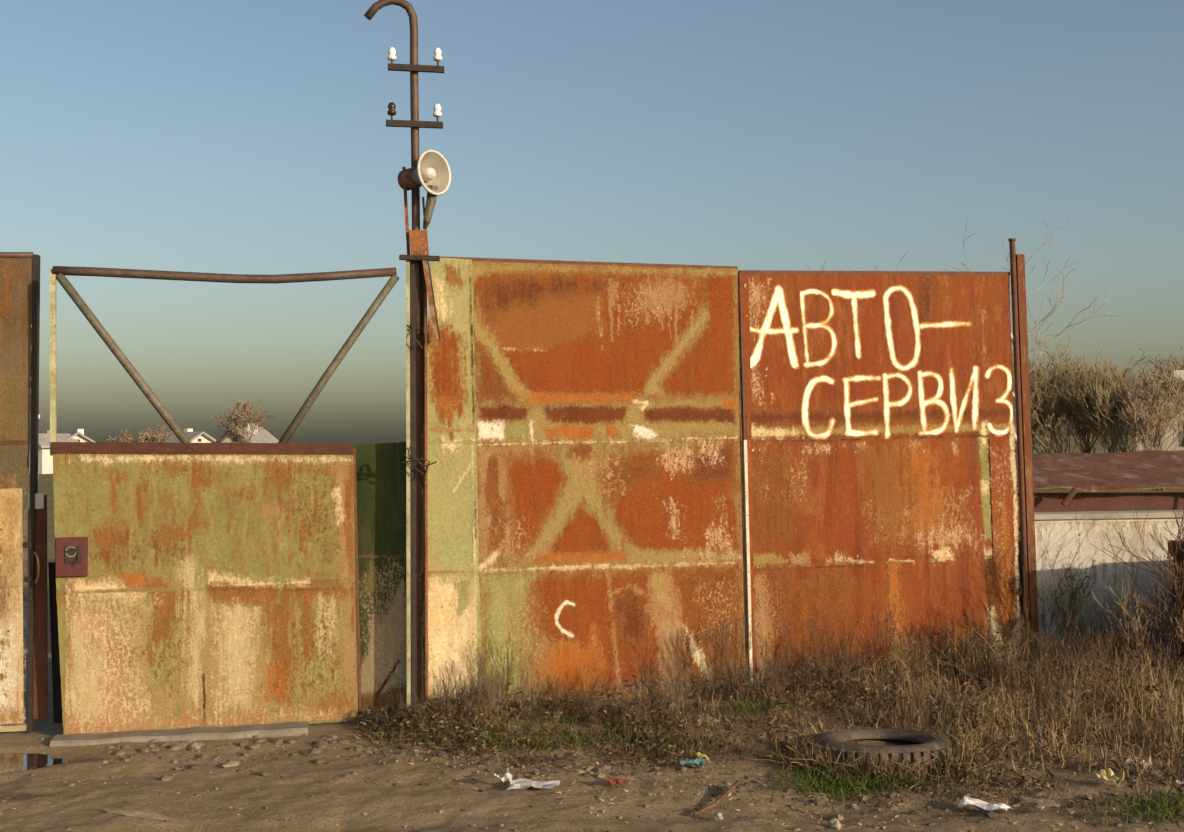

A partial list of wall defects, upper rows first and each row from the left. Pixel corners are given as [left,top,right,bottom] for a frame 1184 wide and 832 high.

peeling [606,268,771,339]
corrosion [918,278,935,323]
corrosion [427,264,777,704]
corrosion [751,405,1010,539]
corrosion [887,558,906,675]
corrosion [986,506,1015,632]